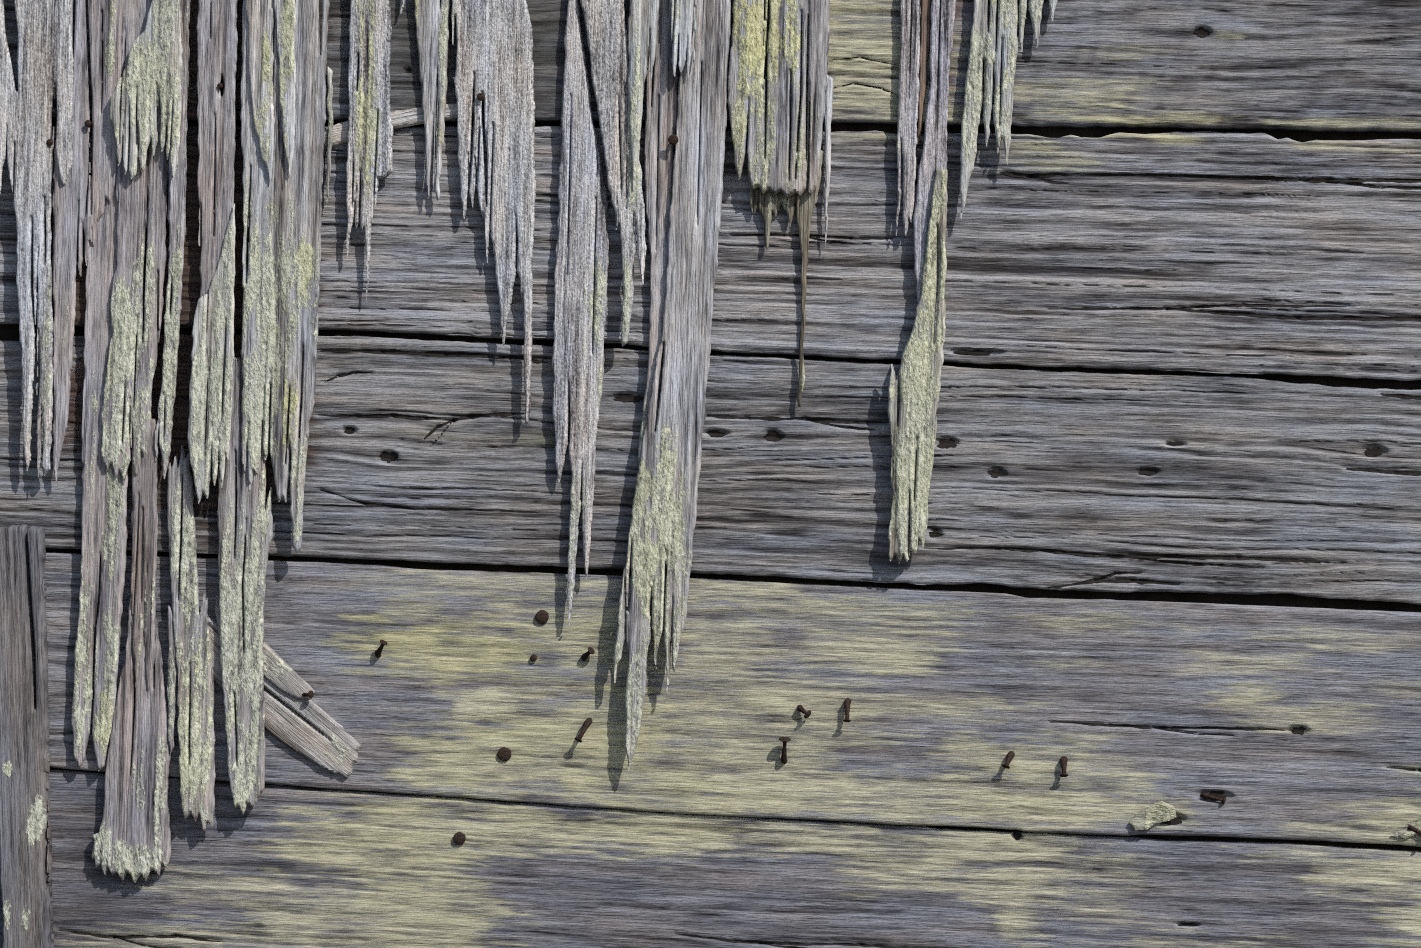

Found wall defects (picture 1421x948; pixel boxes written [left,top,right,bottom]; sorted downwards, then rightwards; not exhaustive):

crack [1049,722,1287,736]